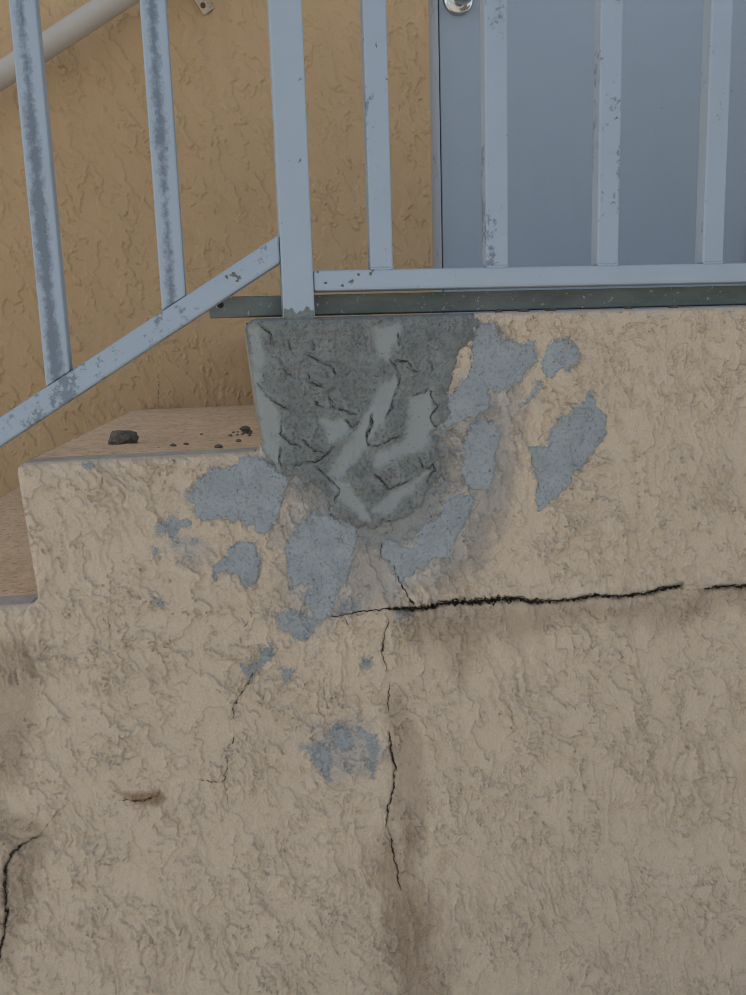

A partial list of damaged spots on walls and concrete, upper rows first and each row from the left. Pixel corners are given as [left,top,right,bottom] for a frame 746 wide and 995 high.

peeling [156,517,198,547]
crack [332,546,746,889]
crack [0,837,37,958]